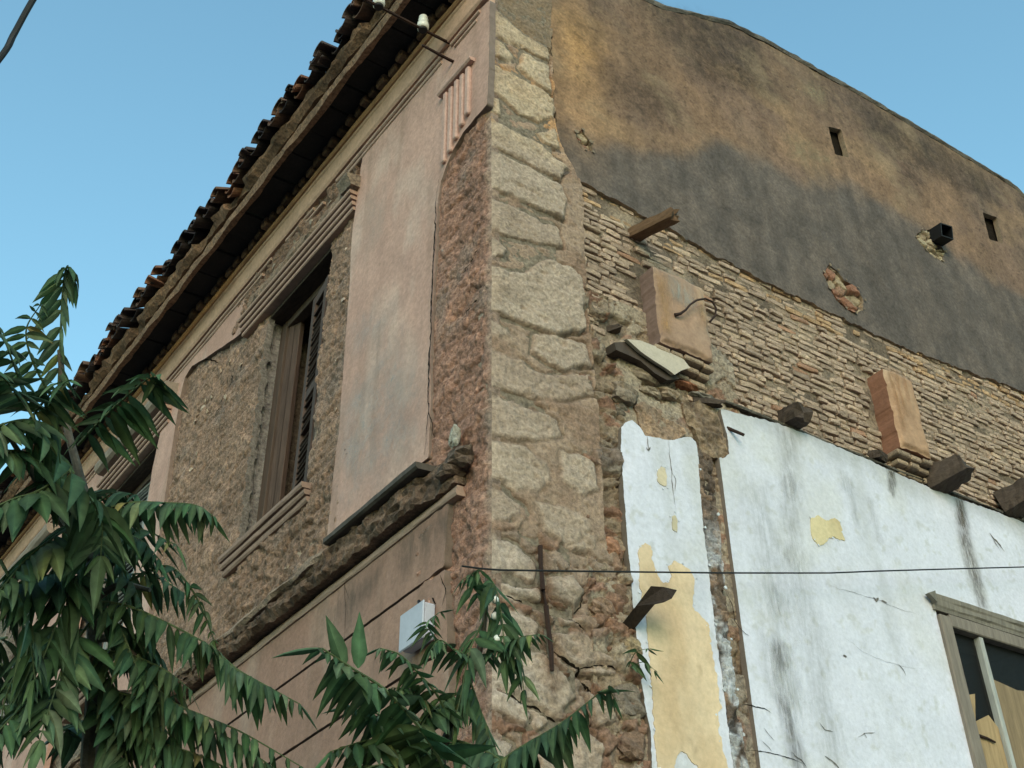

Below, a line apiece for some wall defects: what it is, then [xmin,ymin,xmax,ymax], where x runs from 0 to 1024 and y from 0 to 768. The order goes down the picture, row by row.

spalling [915,228,947,262]
spalling [823,263,867,314]
peeling [656,465,669,489]
peeling [810,515,845,546]
water stain [959,502,983,602]
crack [646,437,839,768]
peeling [638,543,728,768]